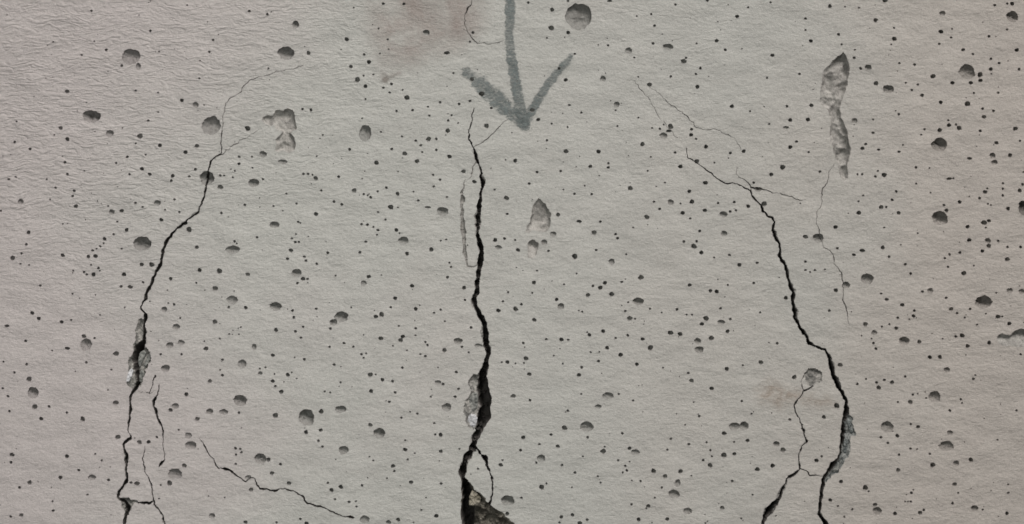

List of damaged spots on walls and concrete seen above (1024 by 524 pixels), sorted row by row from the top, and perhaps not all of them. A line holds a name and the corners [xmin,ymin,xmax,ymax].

spalling [113,318,170,389]
crack [117,65,303,524]
crack [199,438,355,519]
spalling [442,374,481,430]
crack [458,109,506,524]
crack [635,81,849,524]